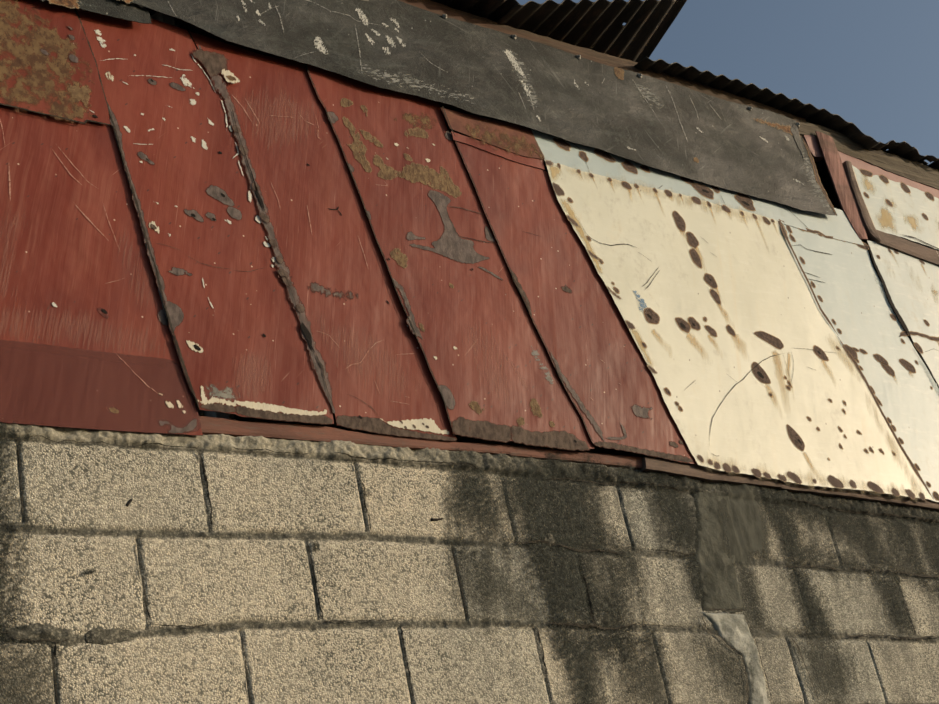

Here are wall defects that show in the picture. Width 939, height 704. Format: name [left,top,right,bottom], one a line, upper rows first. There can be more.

rust [48,0,80,9]
peeling [327,98,503,280]
rust [532,133,604,270]
rust [553,138,650,190]
rust [859,169,889,198]
rust [644,308,660,324]
rust [653,177,939,500]
peeling [159,393,197,434]
peeling [198,385,694,463]
water stain [444,449,707,704]
water stain [740,568,767,631]
water stain [757,486,939,702]